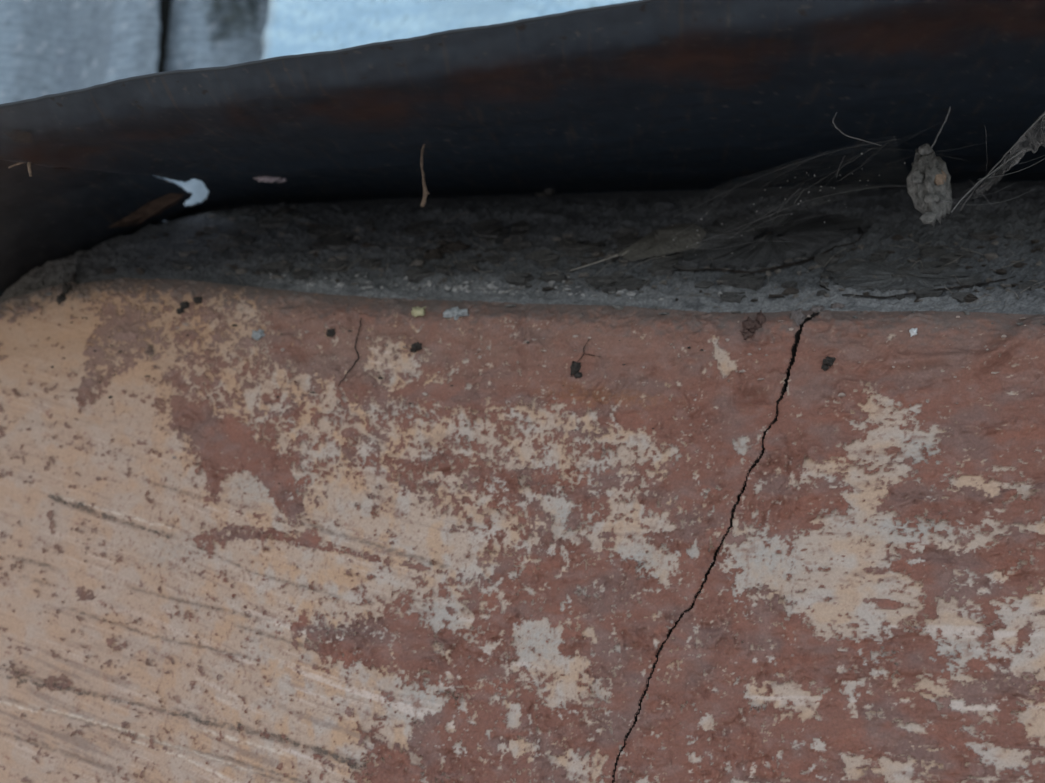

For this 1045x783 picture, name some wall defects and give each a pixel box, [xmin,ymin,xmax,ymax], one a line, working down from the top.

peeling [708,335,738,377]
crack [612,230,1016,783]
peeling [0,281,700,783]
peeling [720,393,1045,723]
peeling [698,713,716,731]
peeling [810,739,826,751]
peeling [895,719,927,733]
peeling [966,699,1045,771]
peeling [839,752,916,783]